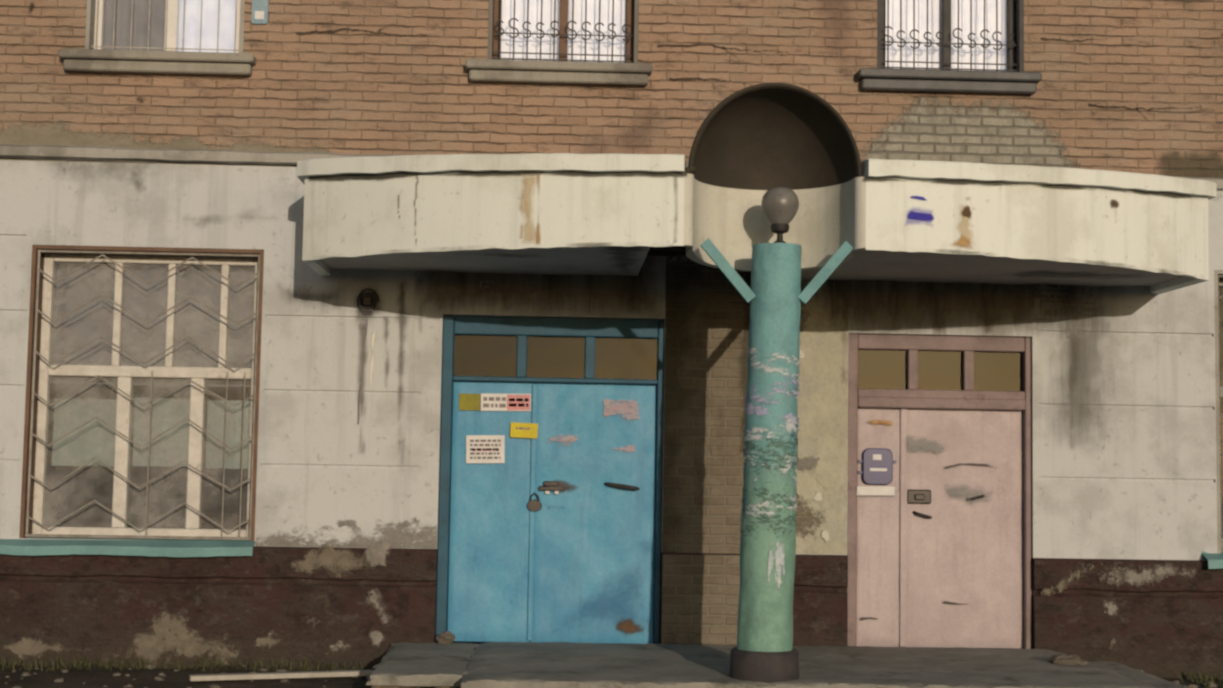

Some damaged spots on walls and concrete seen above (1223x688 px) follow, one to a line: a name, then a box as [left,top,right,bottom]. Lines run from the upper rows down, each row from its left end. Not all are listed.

rust [523,178,540,243]
rust [956,206,971,246]
leakage [386,283,405,374]
flaking render [661,256,750,645]
peeling [796,470,829,542]
peeling [255,518,437,577]
peeling [767,532,785,590]
flaking render [1041,563,1194,596]
flaking render [5,637,89,658]
flaking render [103,609,240,664]
flaking render [256,633,282,647]